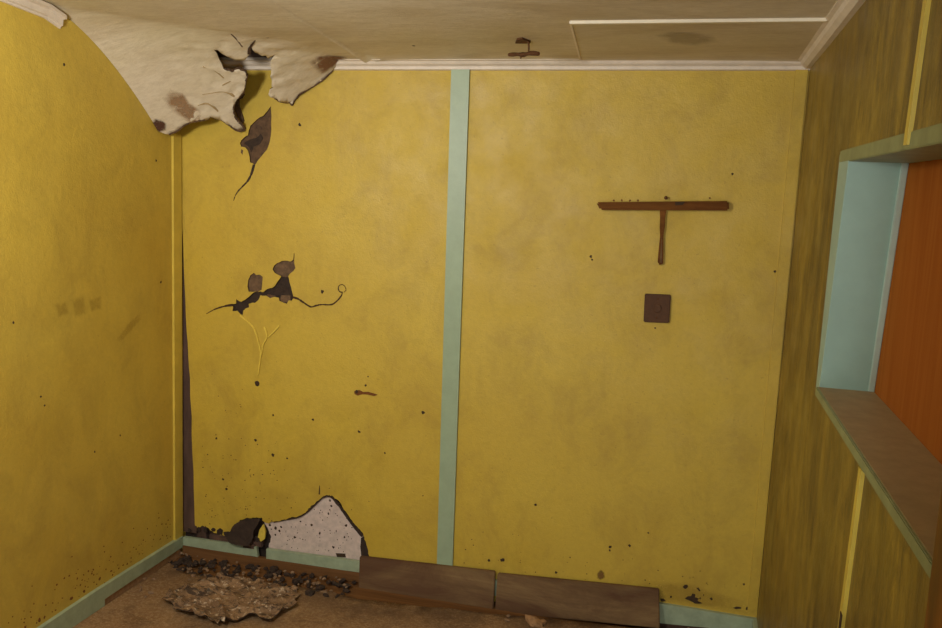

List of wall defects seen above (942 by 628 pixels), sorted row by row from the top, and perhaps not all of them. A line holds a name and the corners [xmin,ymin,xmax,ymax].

flaking render [186,485,369,560]